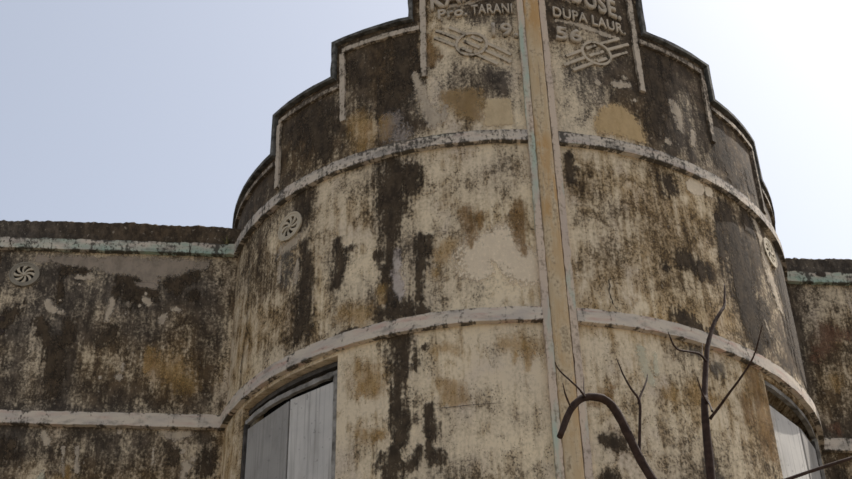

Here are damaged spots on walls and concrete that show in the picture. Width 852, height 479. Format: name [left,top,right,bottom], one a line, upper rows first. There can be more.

damp [288,92,340,163]
damp [346,58,361,89]
damp [375,22,426,142]
damp [564,151,580,187]
damp [637,34,756,198]
damp [0,298,78,399]
damp [53,264,93,305]
damp [371,155,434,310]
damp [372,333,447,479]
damp [660,196,810,393]